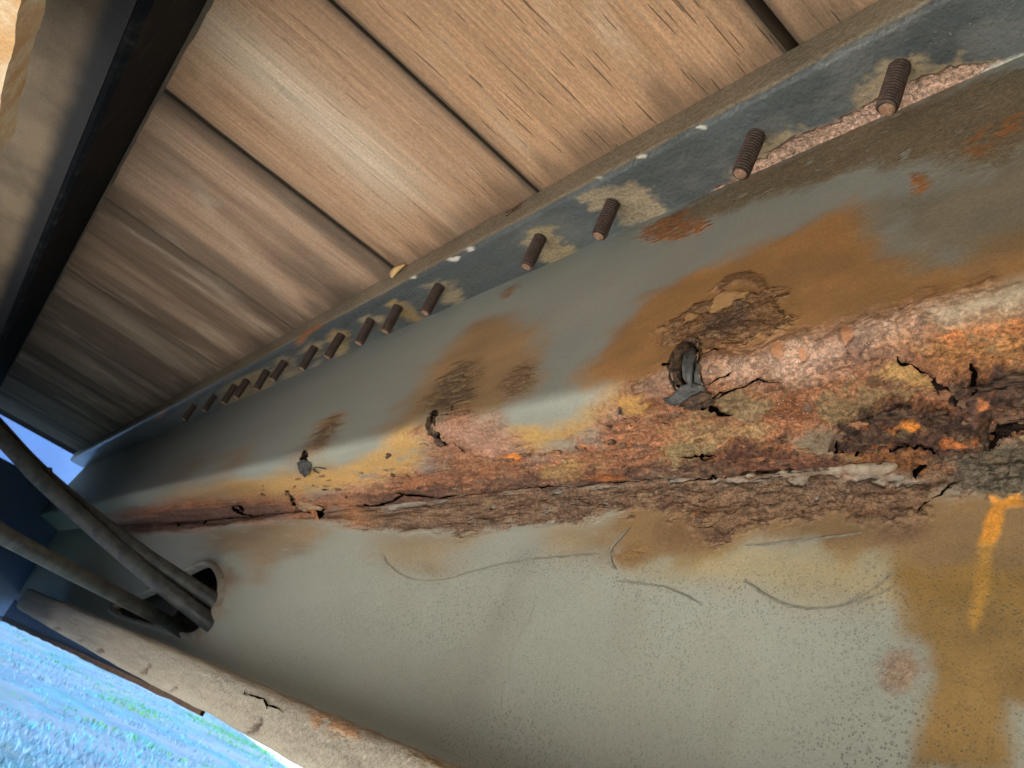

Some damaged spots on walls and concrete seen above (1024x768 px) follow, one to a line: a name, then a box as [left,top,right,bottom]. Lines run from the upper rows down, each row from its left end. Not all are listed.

peeling [710,290,751,311]
peeling [233,430,387,480]
peeling [501,379,607,429]
corrosion [100,57,1024,649]
peeling [655,392,773,467]
crack [697,348,779,417]
peeling [787,362,939,456]
crack [896,356,935,379]
crack [889,444,957,513]
crack [969,363,978,396]
crack [241,690,282,712]
corrosion [866,646,931,704]